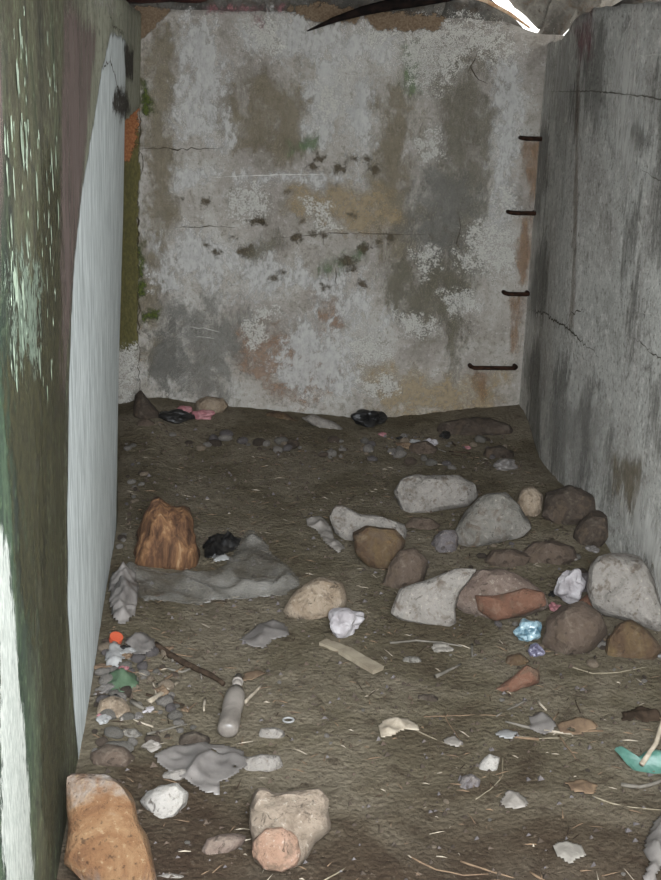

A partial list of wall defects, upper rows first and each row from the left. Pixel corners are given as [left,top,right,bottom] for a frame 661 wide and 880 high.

crack [551,90,661,100]
crack [529,309,597,356]
leakage [0,4,529,880]